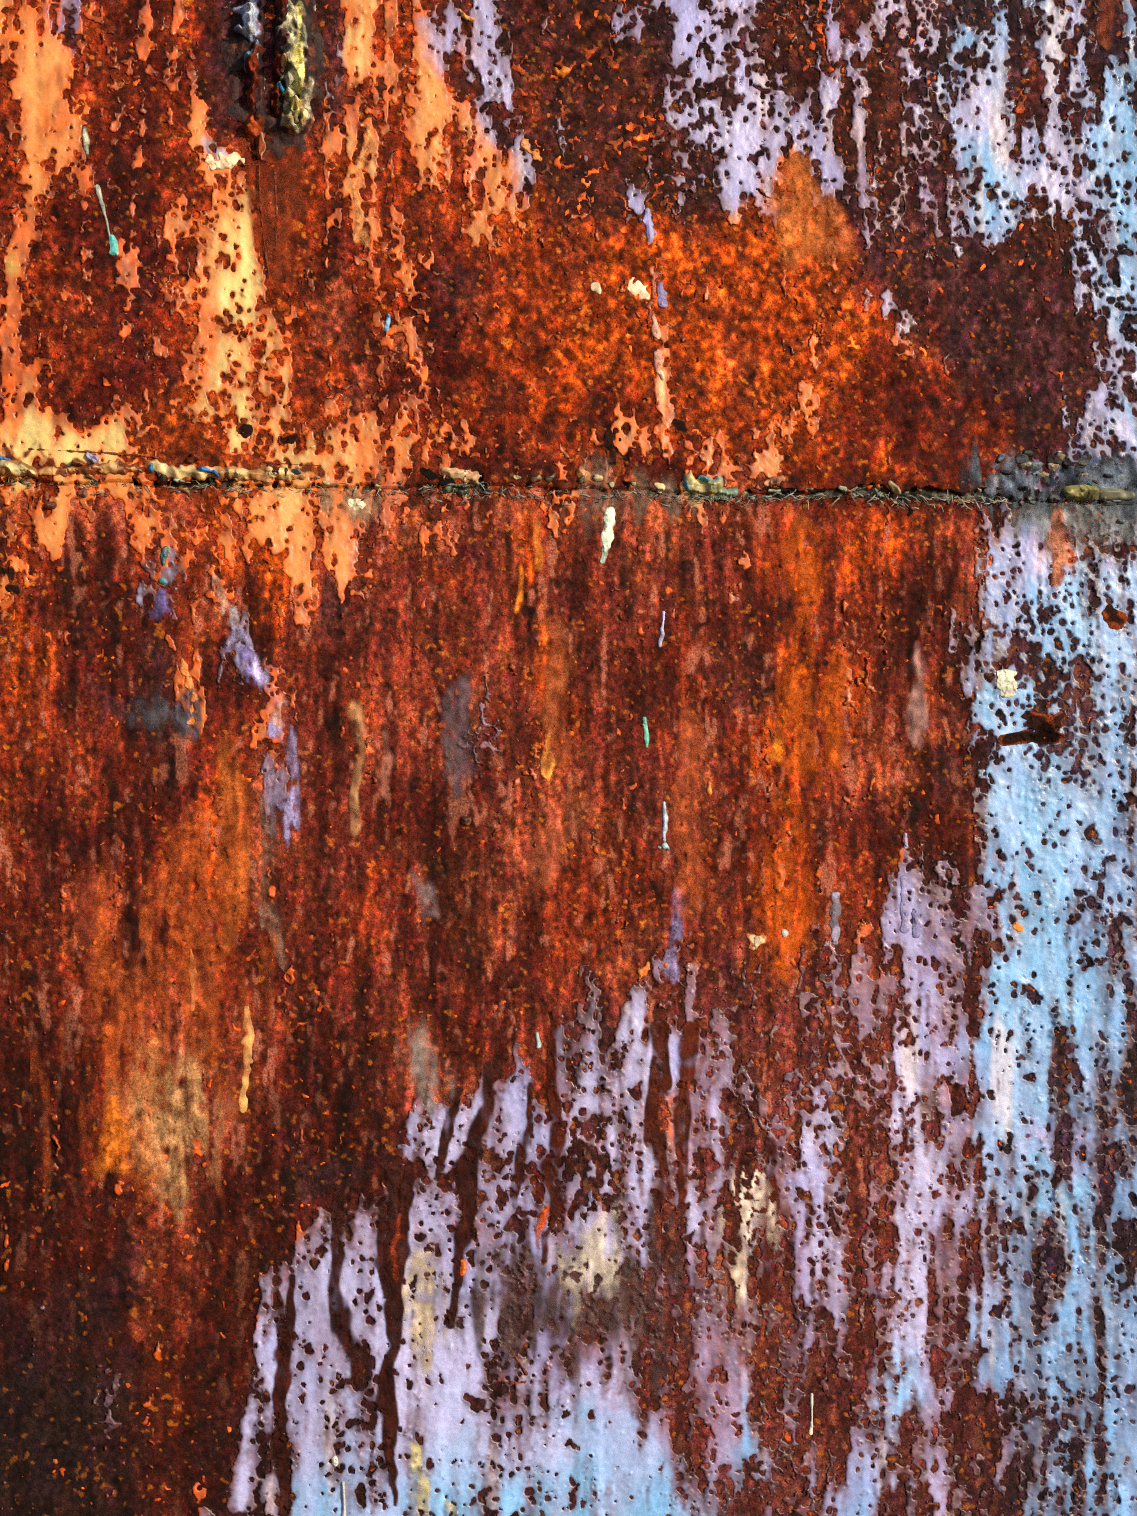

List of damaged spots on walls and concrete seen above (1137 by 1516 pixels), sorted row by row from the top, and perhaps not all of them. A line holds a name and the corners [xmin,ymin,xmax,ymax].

rust [0,138,221,544]
peeling [0,0,548,826]
rust [299,463,348,477]
rust [295,123,391,386]
peeling [543,85,588,178]
peeling [522,258,842,546]
peeling [721,529,783,605]
peeling [833,599,889,737]
peeling [862,274,932,359]
rust [418,1052,510,1329]
rust [511,1082,534,1209]
rust [323,1156,415,1506]